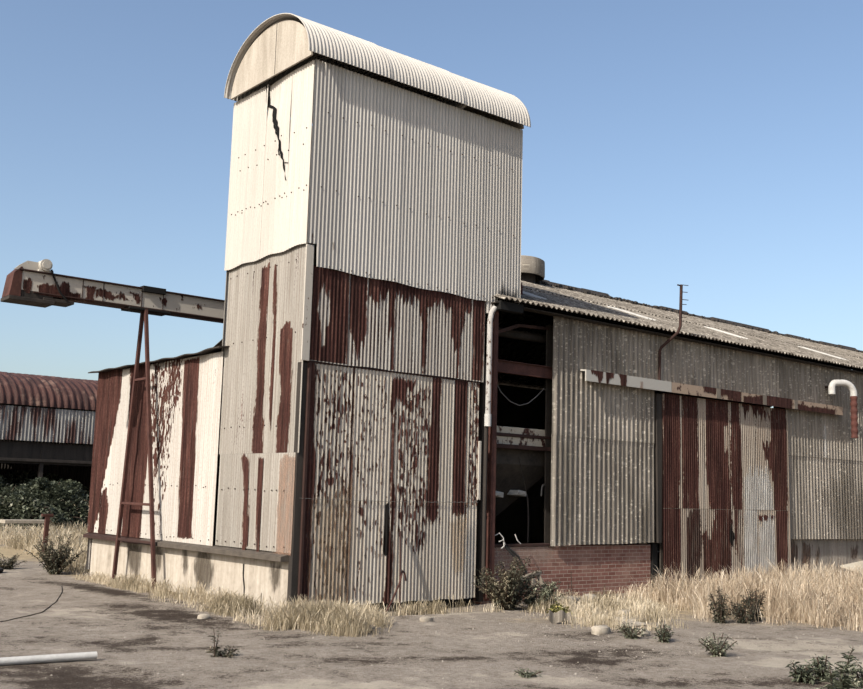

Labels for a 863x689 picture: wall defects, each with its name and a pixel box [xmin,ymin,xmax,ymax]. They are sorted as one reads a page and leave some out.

crack [266,85,288,180]
rust [23,277,141,304]
rust [87,356,200,539]
rust [241,262,295,555]
rust [302,265,485,607]
rust [591,370,627,386]
rust [662,386,836,587]